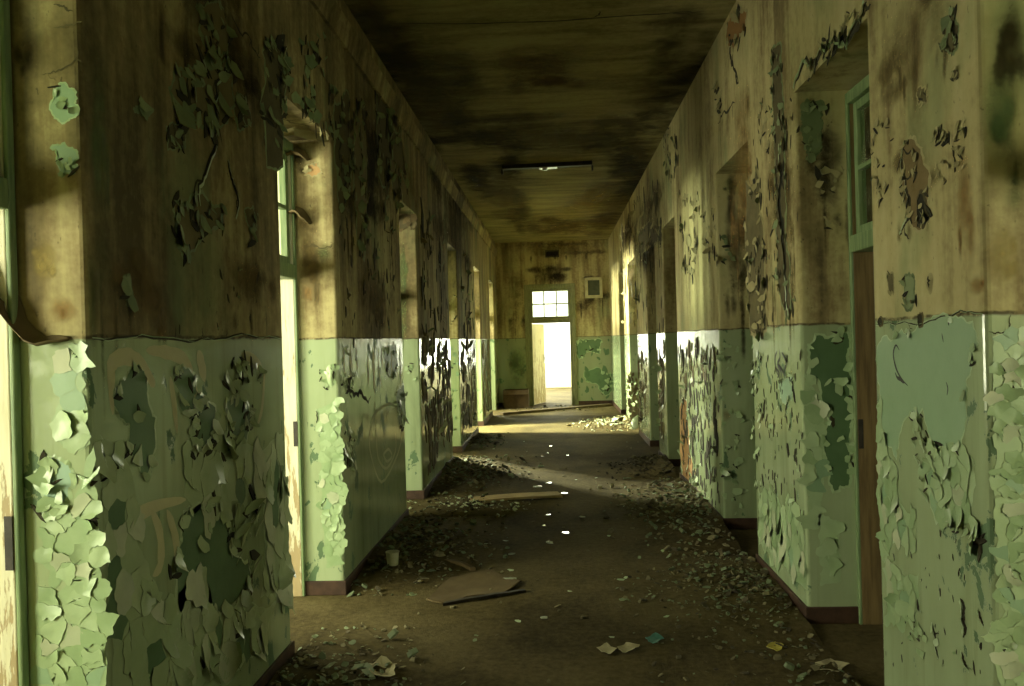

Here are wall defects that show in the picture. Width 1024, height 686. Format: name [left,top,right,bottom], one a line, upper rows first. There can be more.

peeling [47,82,80,124]
peeling [50,142,80,178]
peeling [25,341,296,686]
peeling [166,32,490,476]
peeling [315,339,371,568]
peeling [575,338,612,401]
peeling [619,41,855,589]
peeling [870,118,967,233]
peeling [875,271,1024,686]